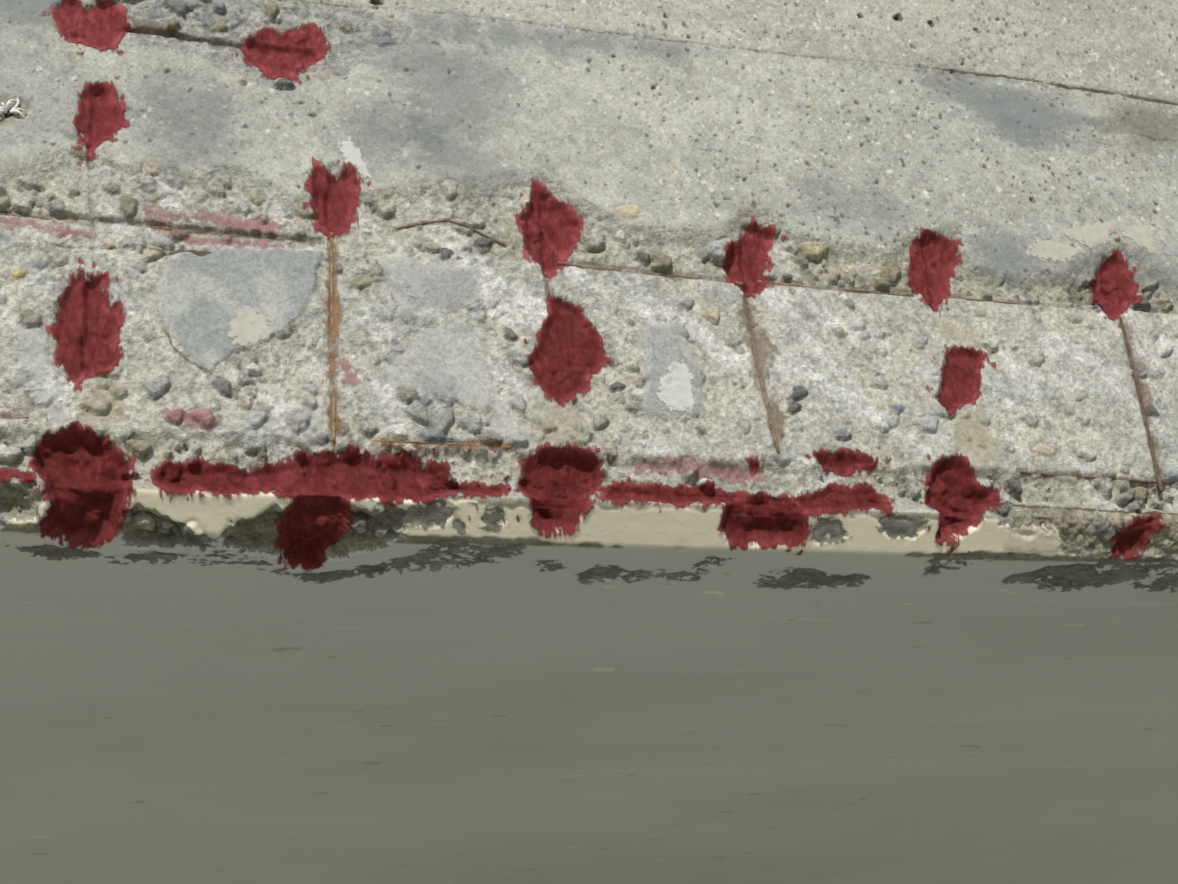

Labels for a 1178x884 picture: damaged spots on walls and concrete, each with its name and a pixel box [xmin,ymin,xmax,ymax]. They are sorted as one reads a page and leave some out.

crack [903,65,1178,105]
corrosion [325,284,341,377]
spalling [0,136,1178,593]
corrosion [328,393,340,430]
corrosion [436,438,512,451]